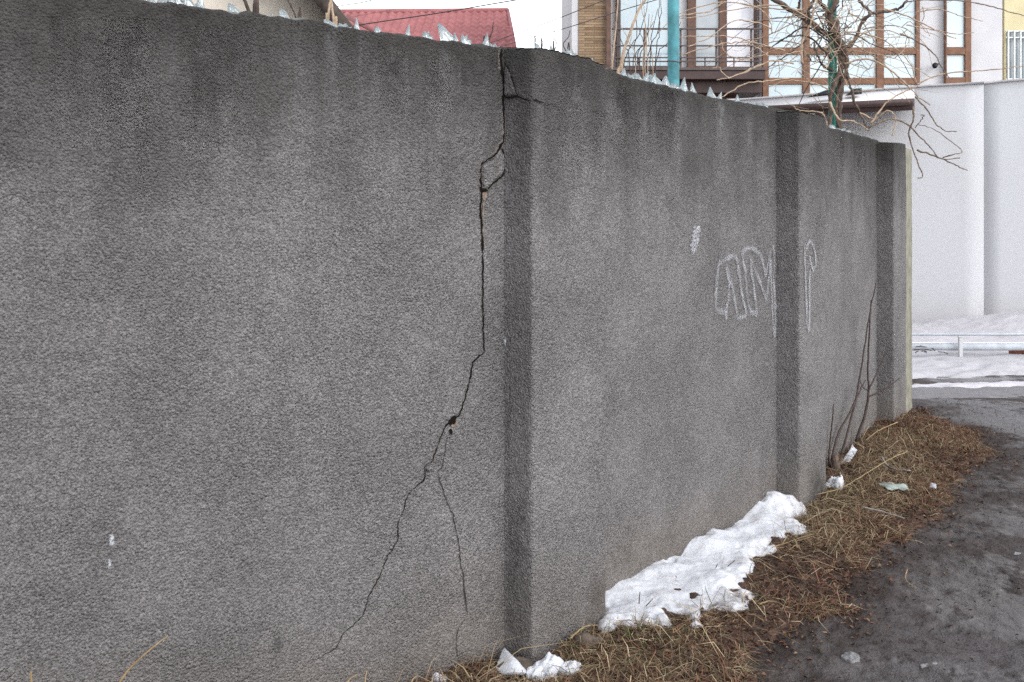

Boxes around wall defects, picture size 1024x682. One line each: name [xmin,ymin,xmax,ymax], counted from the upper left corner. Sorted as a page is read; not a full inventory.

crack [293,48,557,677]